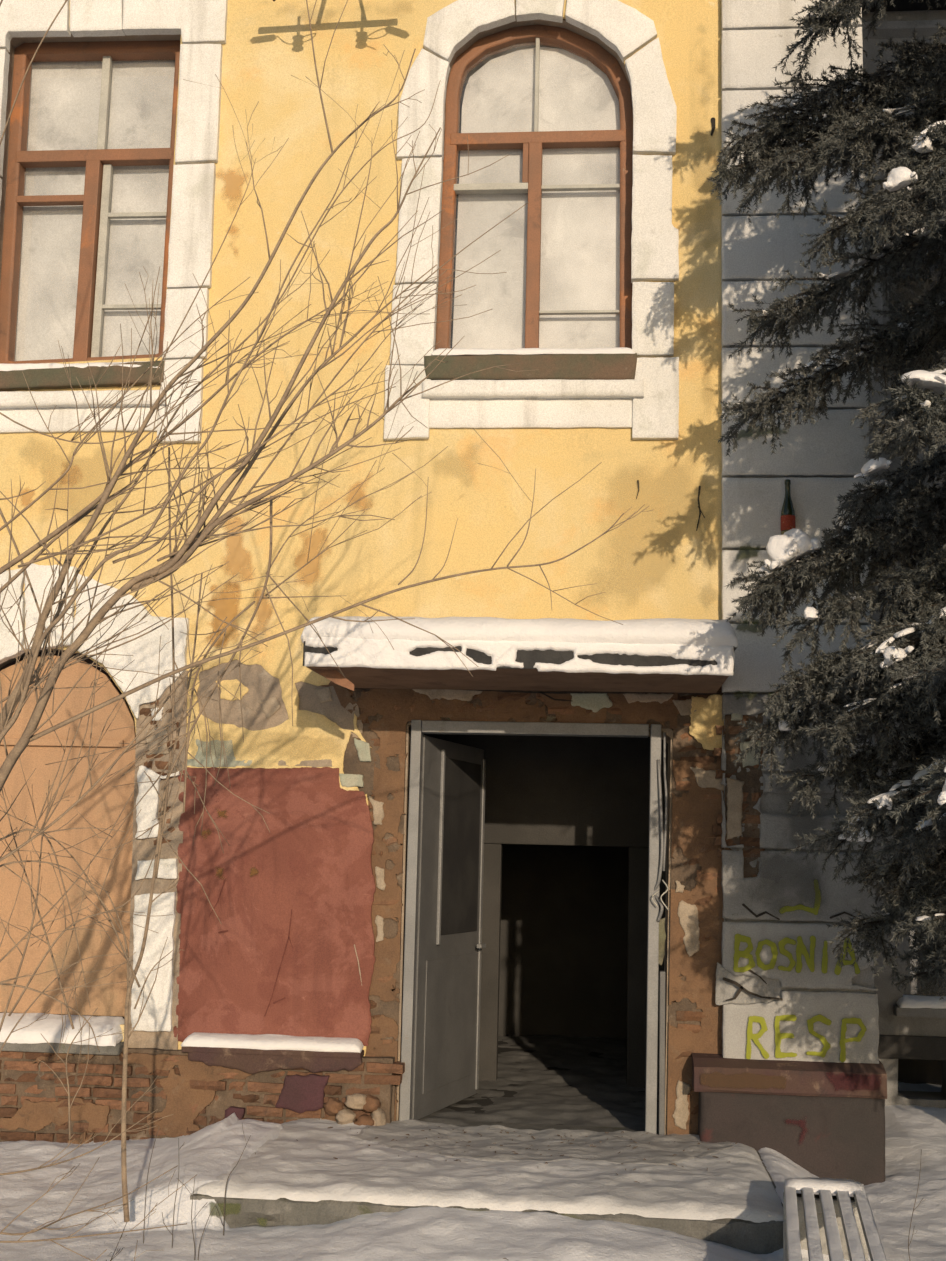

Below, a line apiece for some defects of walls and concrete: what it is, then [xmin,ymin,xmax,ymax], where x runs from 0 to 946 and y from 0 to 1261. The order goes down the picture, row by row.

spalling [0,659,782,1143]